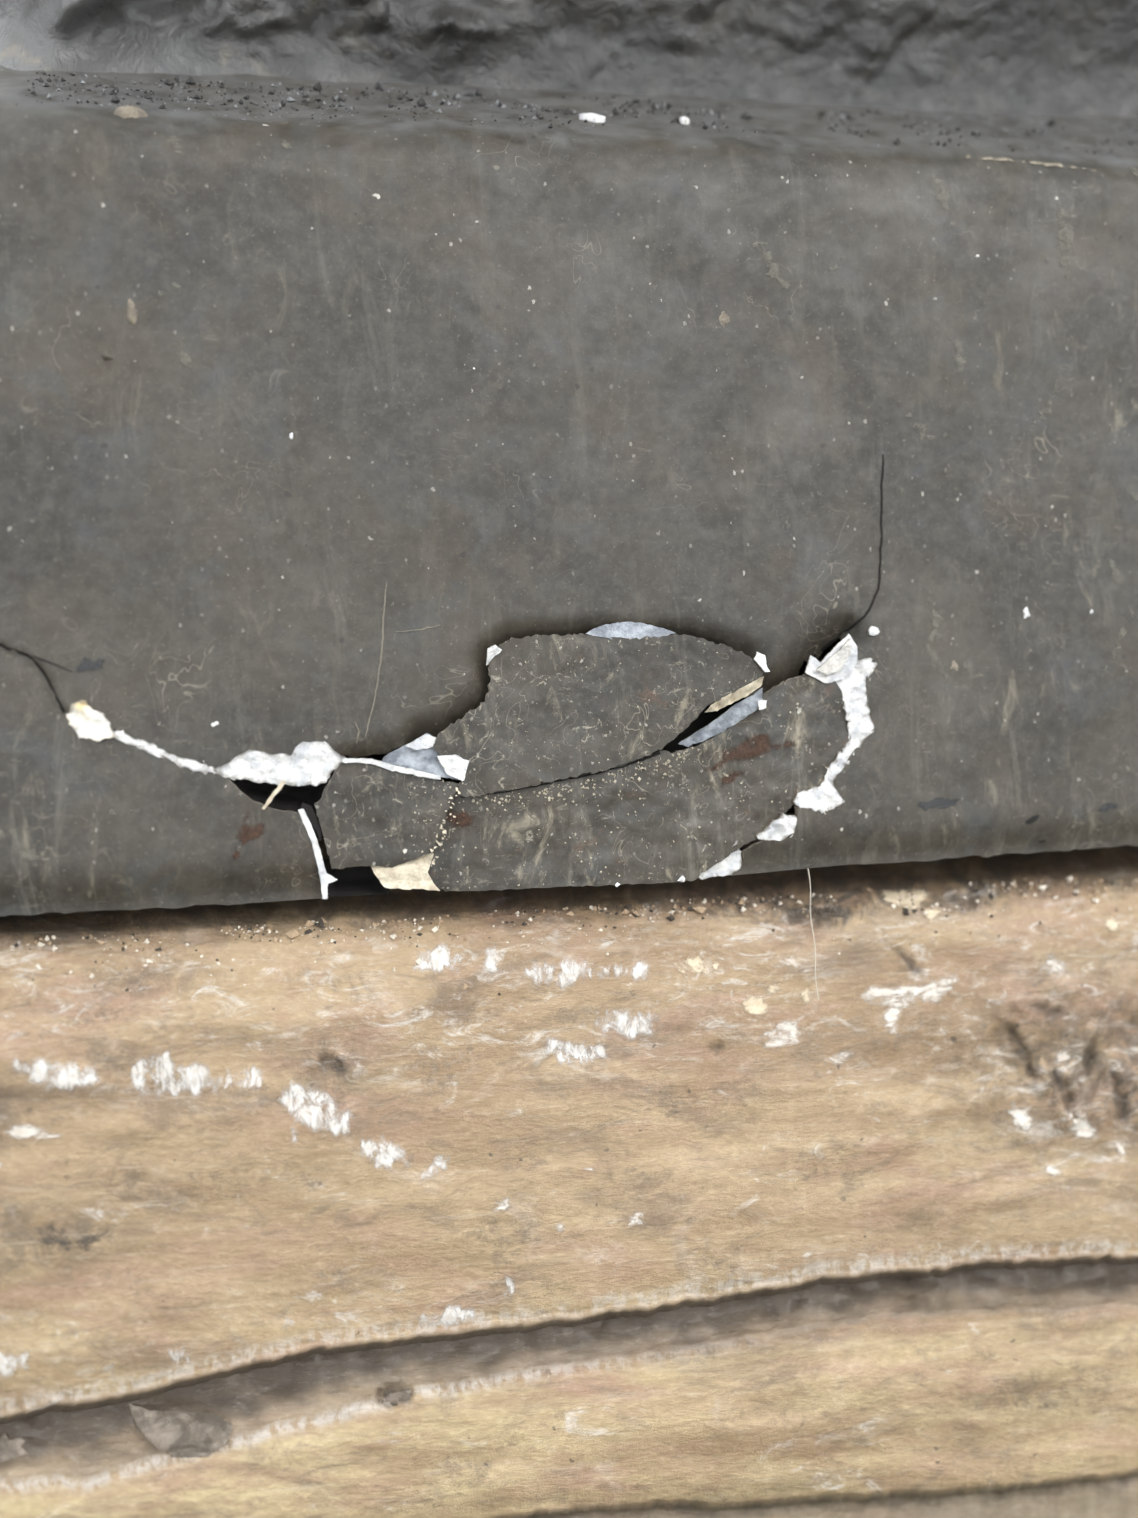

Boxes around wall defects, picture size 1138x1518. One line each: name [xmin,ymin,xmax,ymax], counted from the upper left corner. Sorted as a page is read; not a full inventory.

crack [806,454,884,663]
crack [0,643,72,713]
peeling [67,626,880,892]
crack [460,750,687,818]
crack [298,802,338,899]